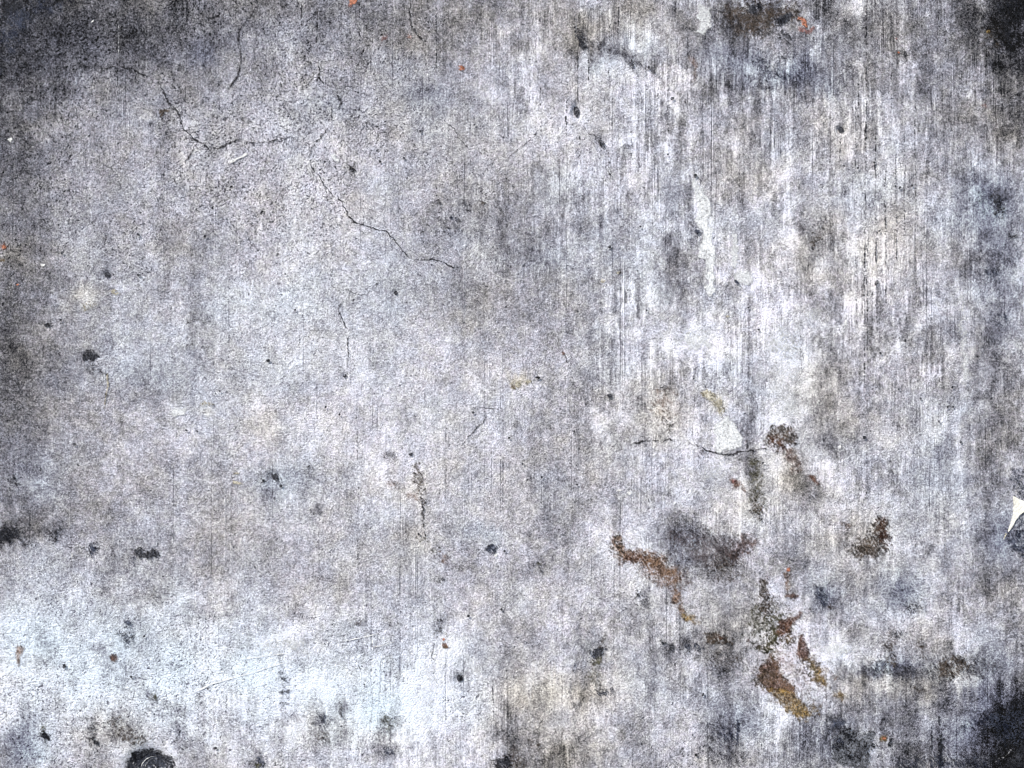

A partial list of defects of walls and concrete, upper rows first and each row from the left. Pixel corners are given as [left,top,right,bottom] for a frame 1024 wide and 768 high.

crack [100,10,286,163]
crack [309,57,454,268]
rust [609,533,844,722]
rust [848,513,892,561]